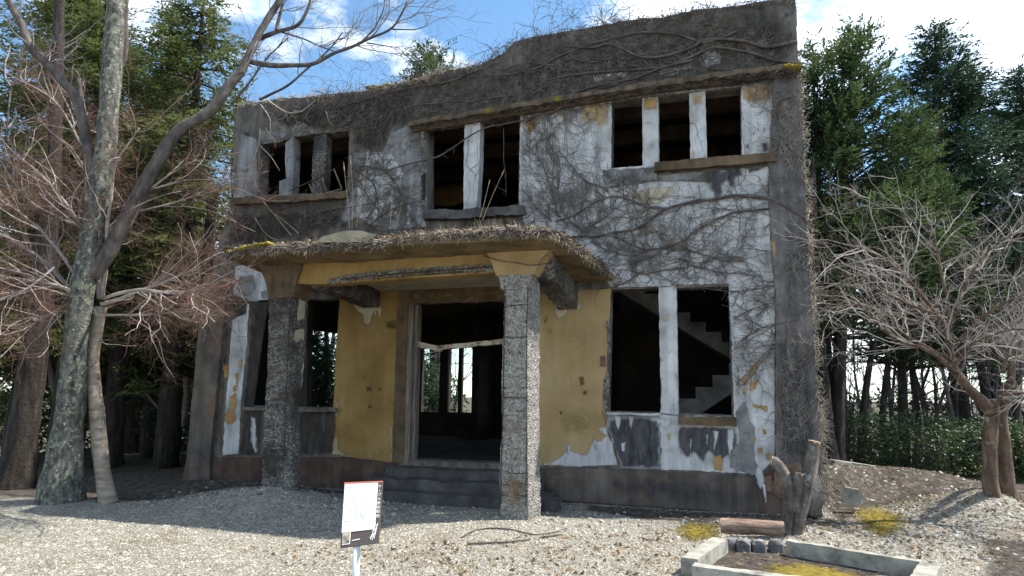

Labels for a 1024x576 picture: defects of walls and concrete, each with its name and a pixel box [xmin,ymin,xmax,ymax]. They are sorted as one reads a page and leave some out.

peeling [603,167,704,236]
spalling [320,264,494,325]
peeling [223,359,242,424]
peeling [531,365,802,544]
water stain [610,415,736,467]
peeling [142,480,344,513]
peeling [734,465,1024,564]